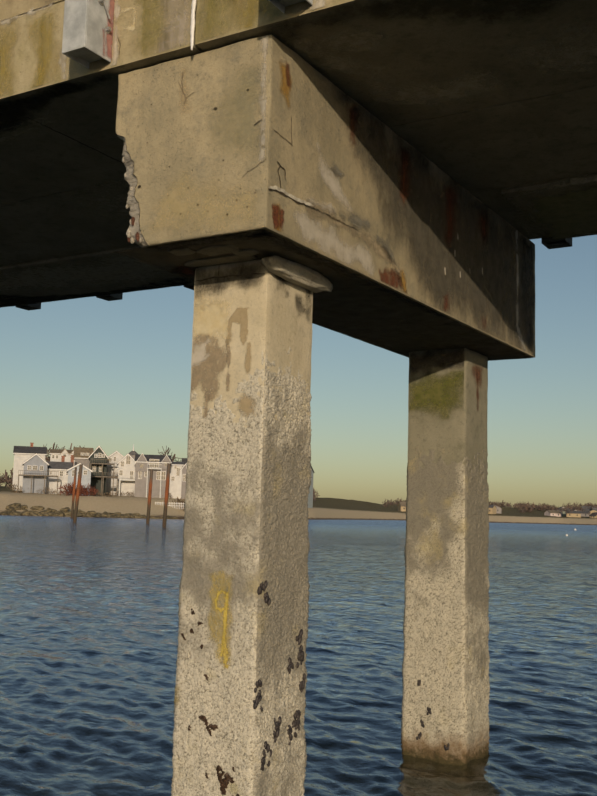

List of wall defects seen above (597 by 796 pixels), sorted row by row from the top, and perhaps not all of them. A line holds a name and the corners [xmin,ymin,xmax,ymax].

water stain [0,54,106,132]
crack [254,117,293,146]
rust [281,64,291,103]
spalling [117,135,148,247]
rust [272,204,284,232]
water stain [0,91,597,375]
crack [243,161,359,231]
peeling [194,302,251,391]